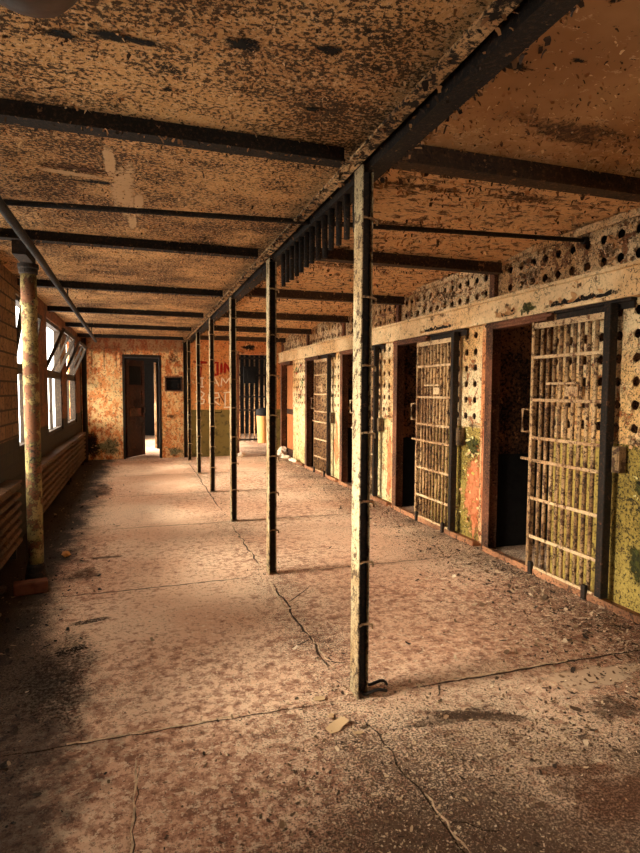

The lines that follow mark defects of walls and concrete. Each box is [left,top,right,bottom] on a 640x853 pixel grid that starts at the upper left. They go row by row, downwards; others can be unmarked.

peeling [91,436,123,457]
peeling [431,420,484,527]
crack [54,465,350,669]
crack [412,649,640,696]
crack [1,703,325,757]
crack [363,717,501,853]